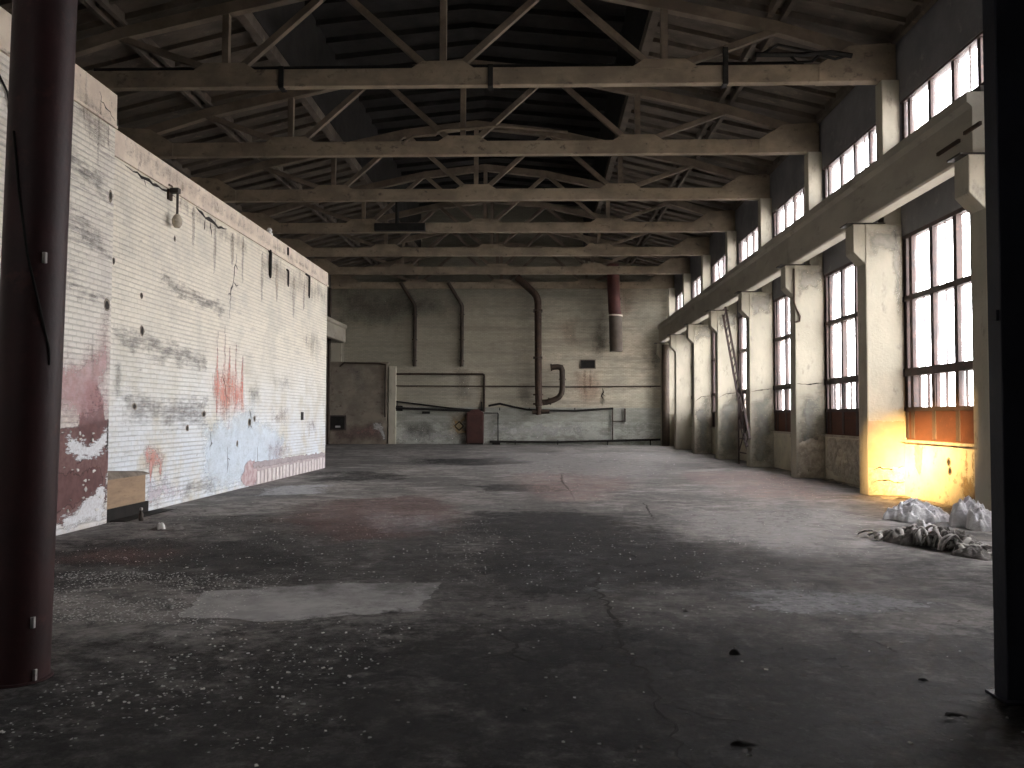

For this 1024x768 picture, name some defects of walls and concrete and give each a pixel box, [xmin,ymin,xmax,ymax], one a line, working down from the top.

crack [125,165,226,235]
peeling [56,385,109,530]
spalling [241,452,325,487]